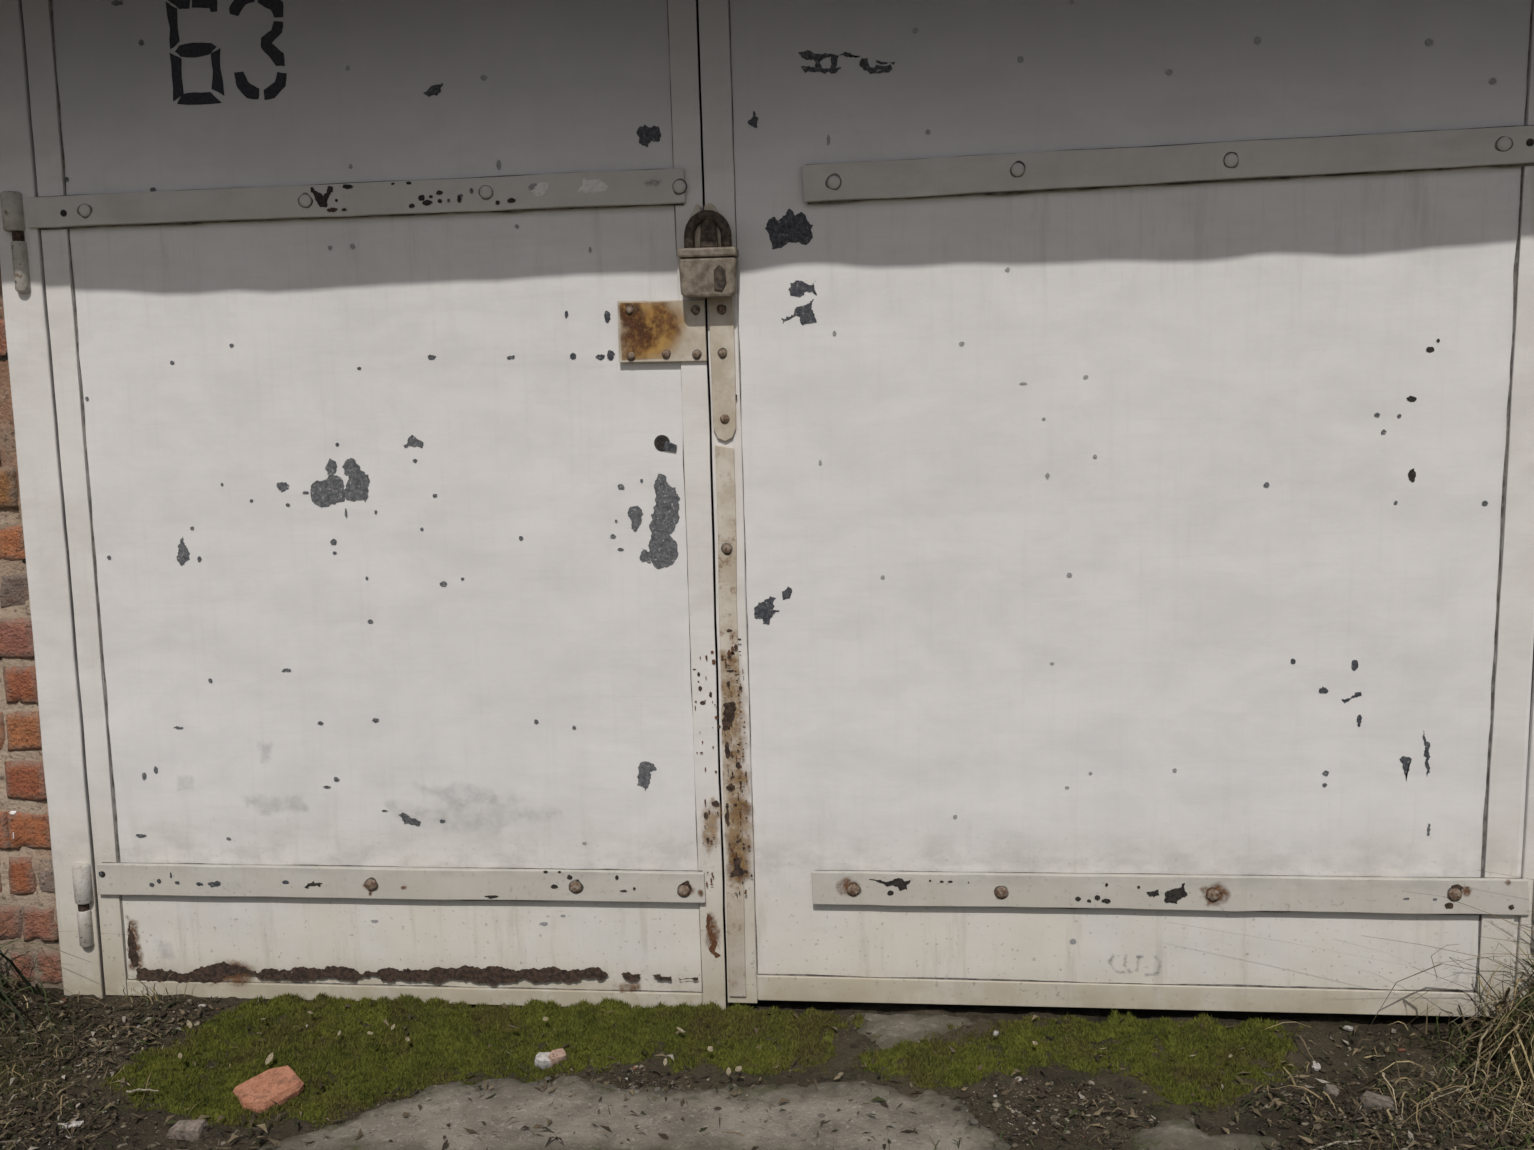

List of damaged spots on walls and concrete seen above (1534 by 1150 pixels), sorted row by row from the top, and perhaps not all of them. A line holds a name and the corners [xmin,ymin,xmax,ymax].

peeling [311,184,354,212]
peeling [765,209,813,250]
peeling [781,280,817,325]
rust [620,302,682,360]
peeling [277,443,377,518]
peeling [610,473,680,569]
peeling [754,587,792,625]
rust [678,629,753,897]
peeling [1137,883,1188,904]
rust [1202,885,1228,904]
rust [127,921,698,992]
rust [706,913,720,958]